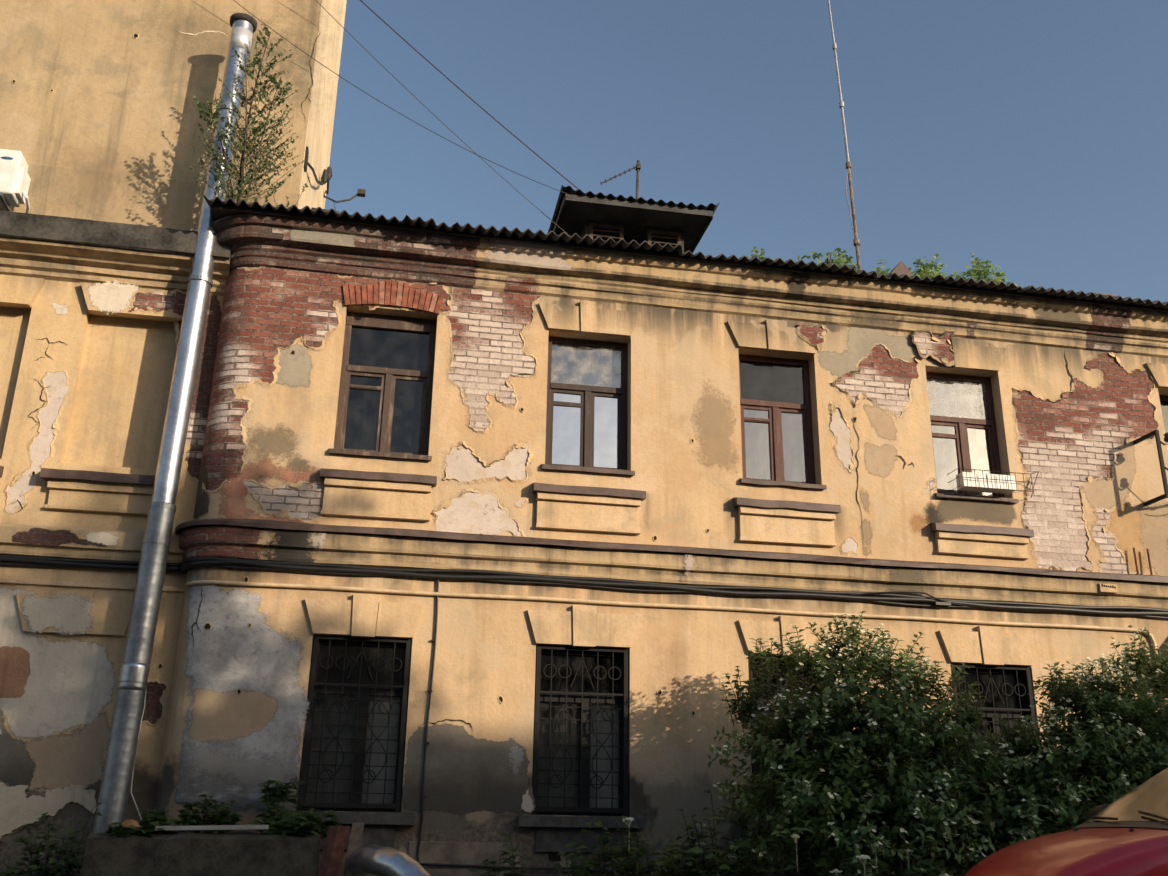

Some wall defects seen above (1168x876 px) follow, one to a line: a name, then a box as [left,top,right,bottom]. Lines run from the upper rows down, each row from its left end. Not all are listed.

crack [301,22,320,124]
spalling [86,279,186,349]
spalling [3,370,72,515]
crack [28,337,67,428]
spalling [182,266,544,552]
spalling [828,329,956,474]
spalling [1012,352,1160,581]
spalling [12,528,120,547]
peeling [0,587,115,738]
spalling [0,782,97,840]
water stain [402,723,530,815]